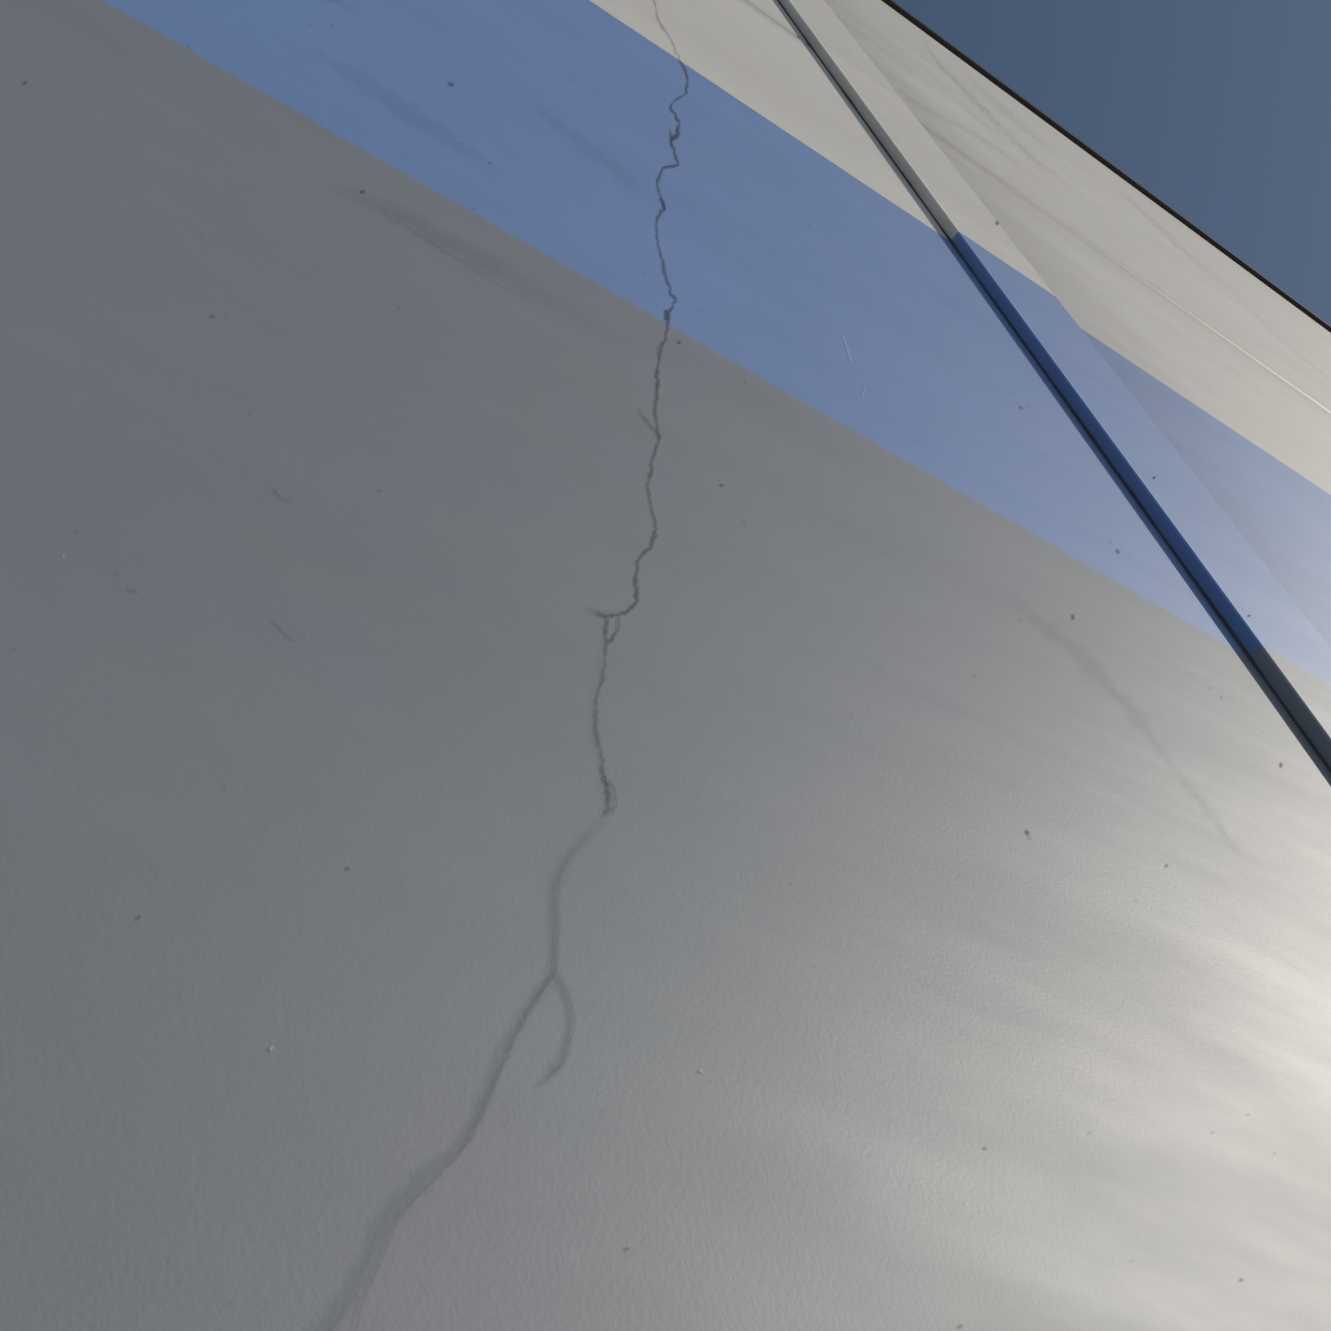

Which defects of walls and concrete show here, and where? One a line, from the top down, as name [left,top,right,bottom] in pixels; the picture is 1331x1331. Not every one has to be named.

crack [657,70,688,219]